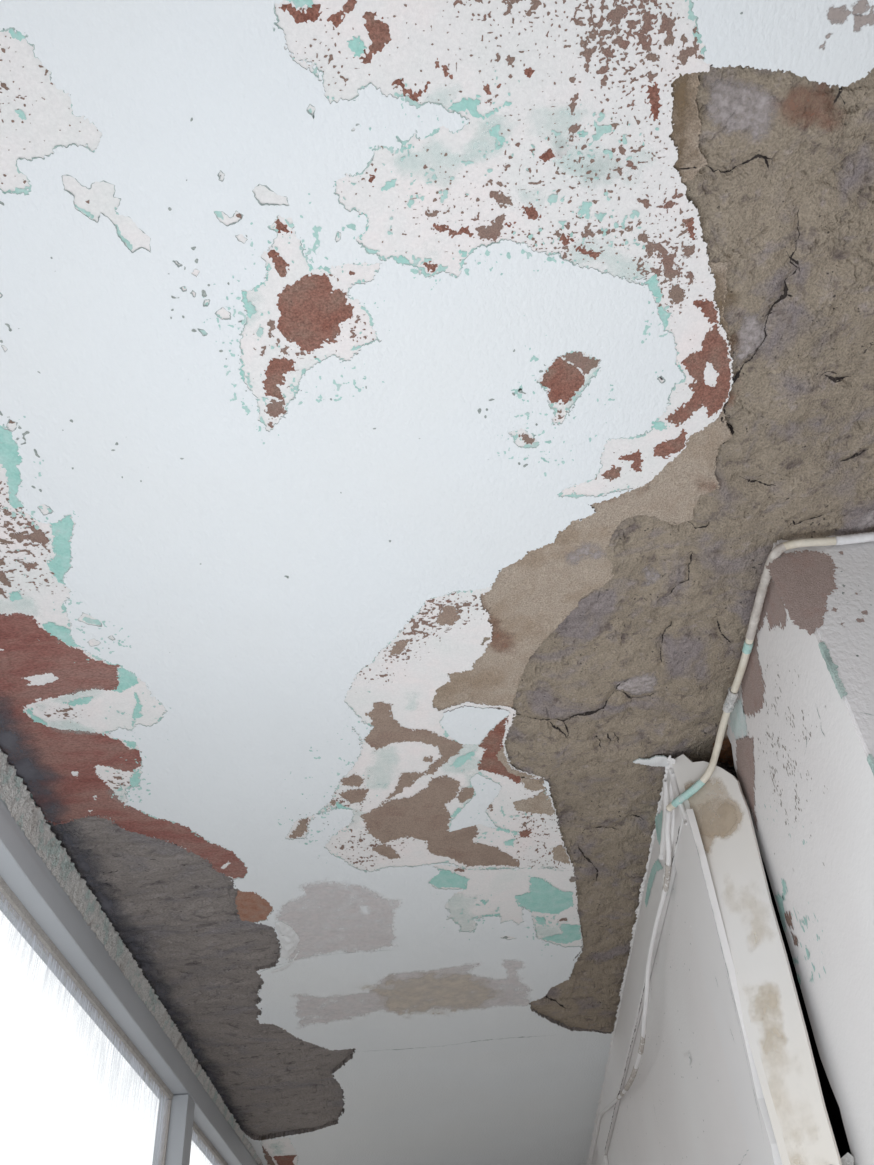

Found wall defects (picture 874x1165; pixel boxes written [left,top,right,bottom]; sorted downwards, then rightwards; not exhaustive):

peeling [0,27,102,195]
peeling [62,175,151,253]
crack [721,210,800,435]
flaking render [180,0,874,1032]
flaking render [0,416,353,1165]
damp [684,781,742,851]